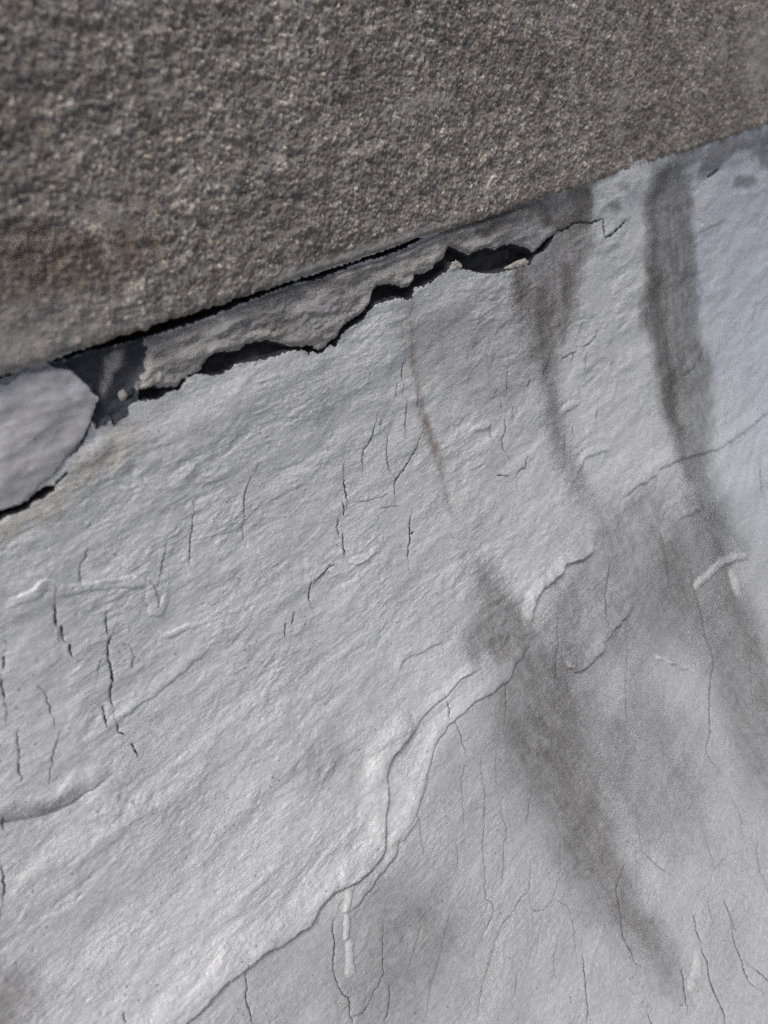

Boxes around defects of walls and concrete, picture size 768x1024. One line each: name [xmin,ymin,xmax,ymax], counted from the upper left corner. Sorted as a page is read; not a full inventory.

spalling [49,201,552,429]
damp [645,158,704,411]
crack [0,421,91,520]
crack [54,548,88,656]
crack [156,500,195,587]
crack [284,355,425,637]
crack [490,322,601,492]
crack [97,611,137,754]
crack [332,899,452,1021]
crack [444,694,589,1024]
crack [616,822,673,971]
crack [681,899,768,1020]